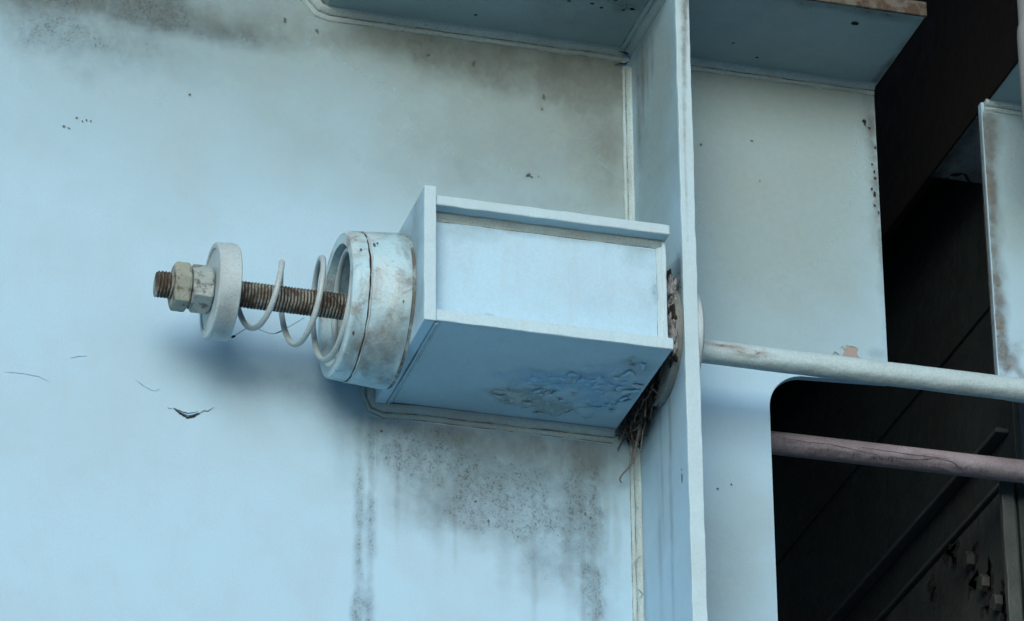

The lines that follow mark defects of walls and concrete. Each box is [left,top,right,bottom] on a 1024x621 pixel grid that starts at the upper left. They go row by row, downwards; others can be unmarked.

rust [981,118,1013,370]
crack [138,381,214,418]
peeling [833,345,860,358]
damp [385,431,603,543]